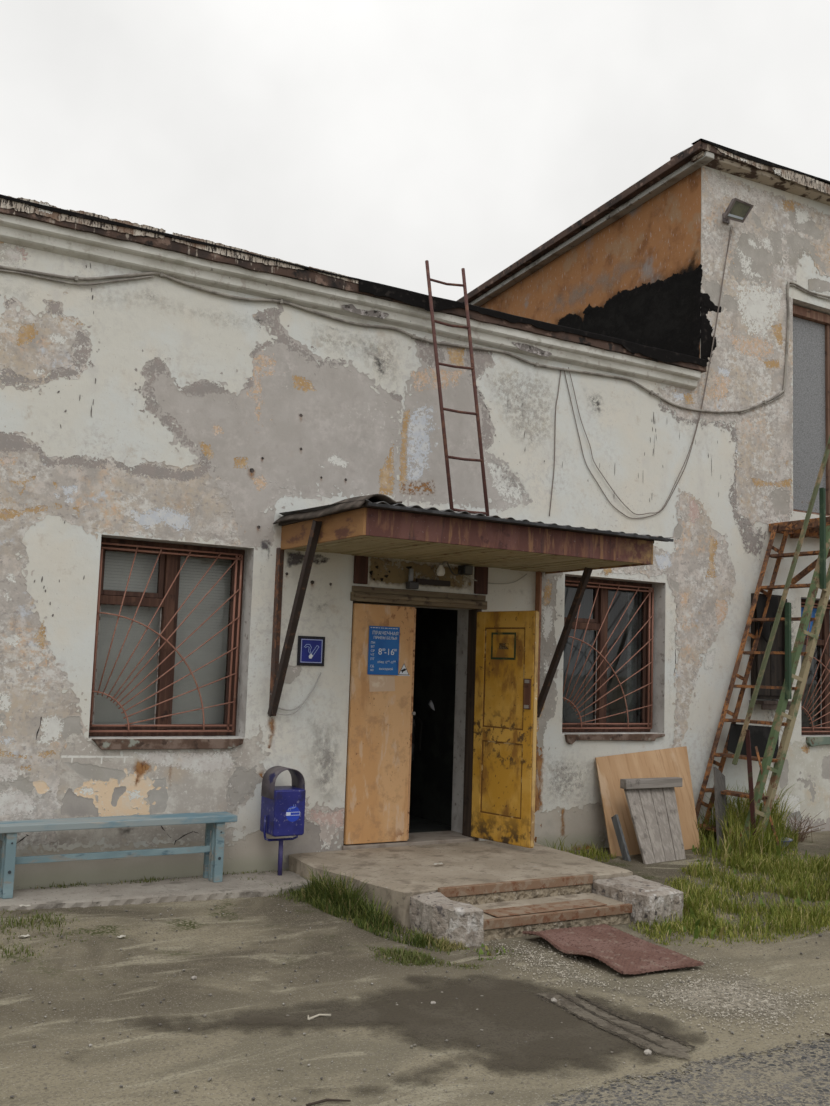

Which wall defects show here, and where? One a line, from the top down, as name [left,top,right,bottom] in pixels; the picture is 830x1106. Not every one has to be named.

peeling [715,146,830,194]
peeling [0,288,533,856]
rust [535,718,543,812]
peeling [598,166,830,748]